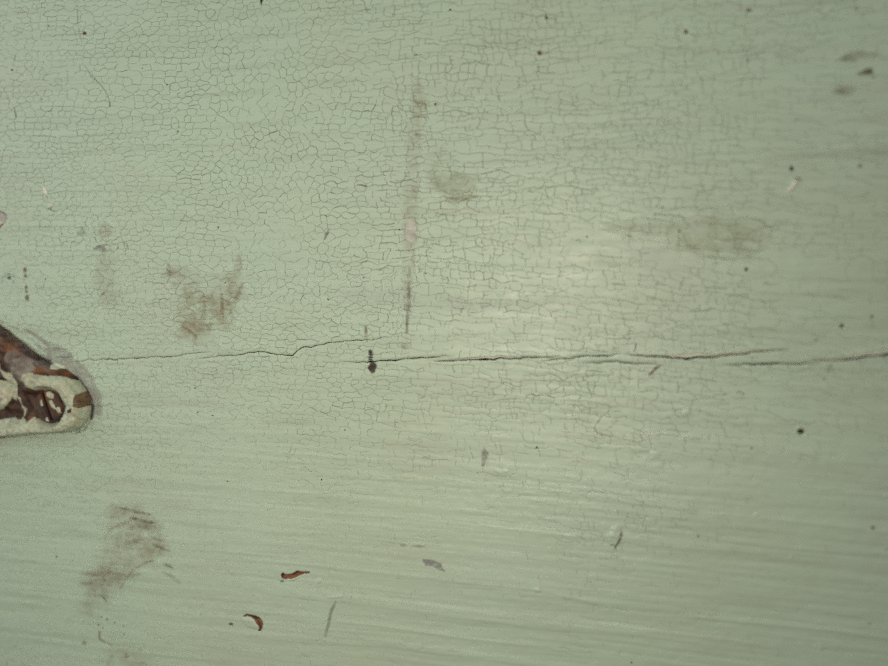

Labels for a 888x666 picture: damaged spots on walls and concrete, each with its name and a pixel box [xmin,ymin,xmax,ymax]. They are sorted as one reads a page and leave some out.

crack [46,337,888,369]